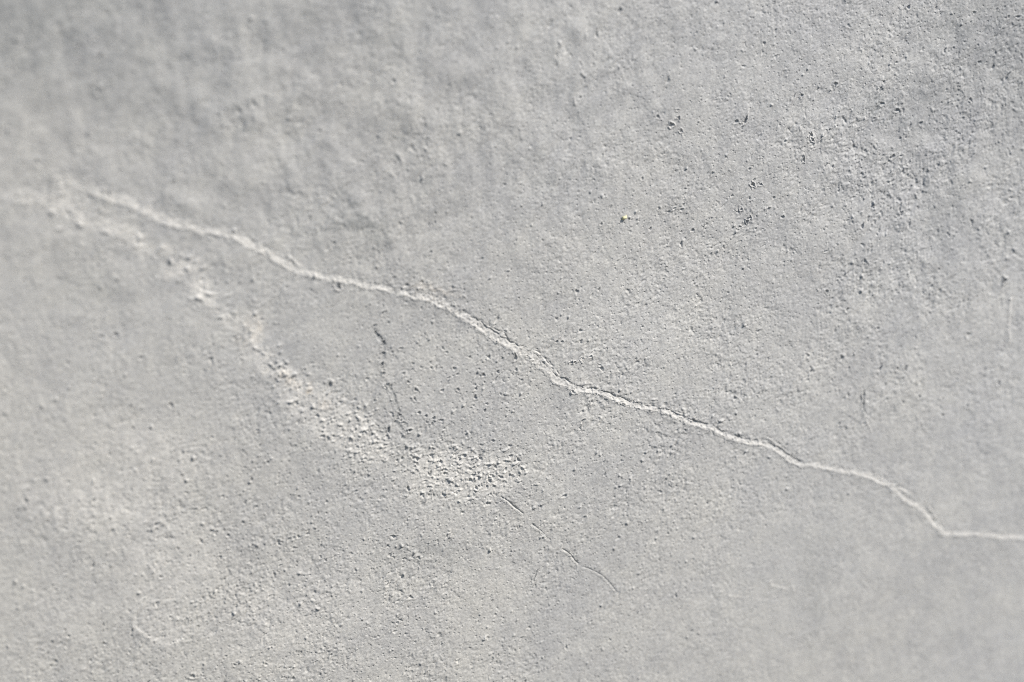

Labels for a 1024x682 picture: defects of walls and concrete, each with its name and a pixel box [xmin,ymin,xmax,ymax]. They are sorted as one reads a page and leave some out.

crack [32,158,1024,541]